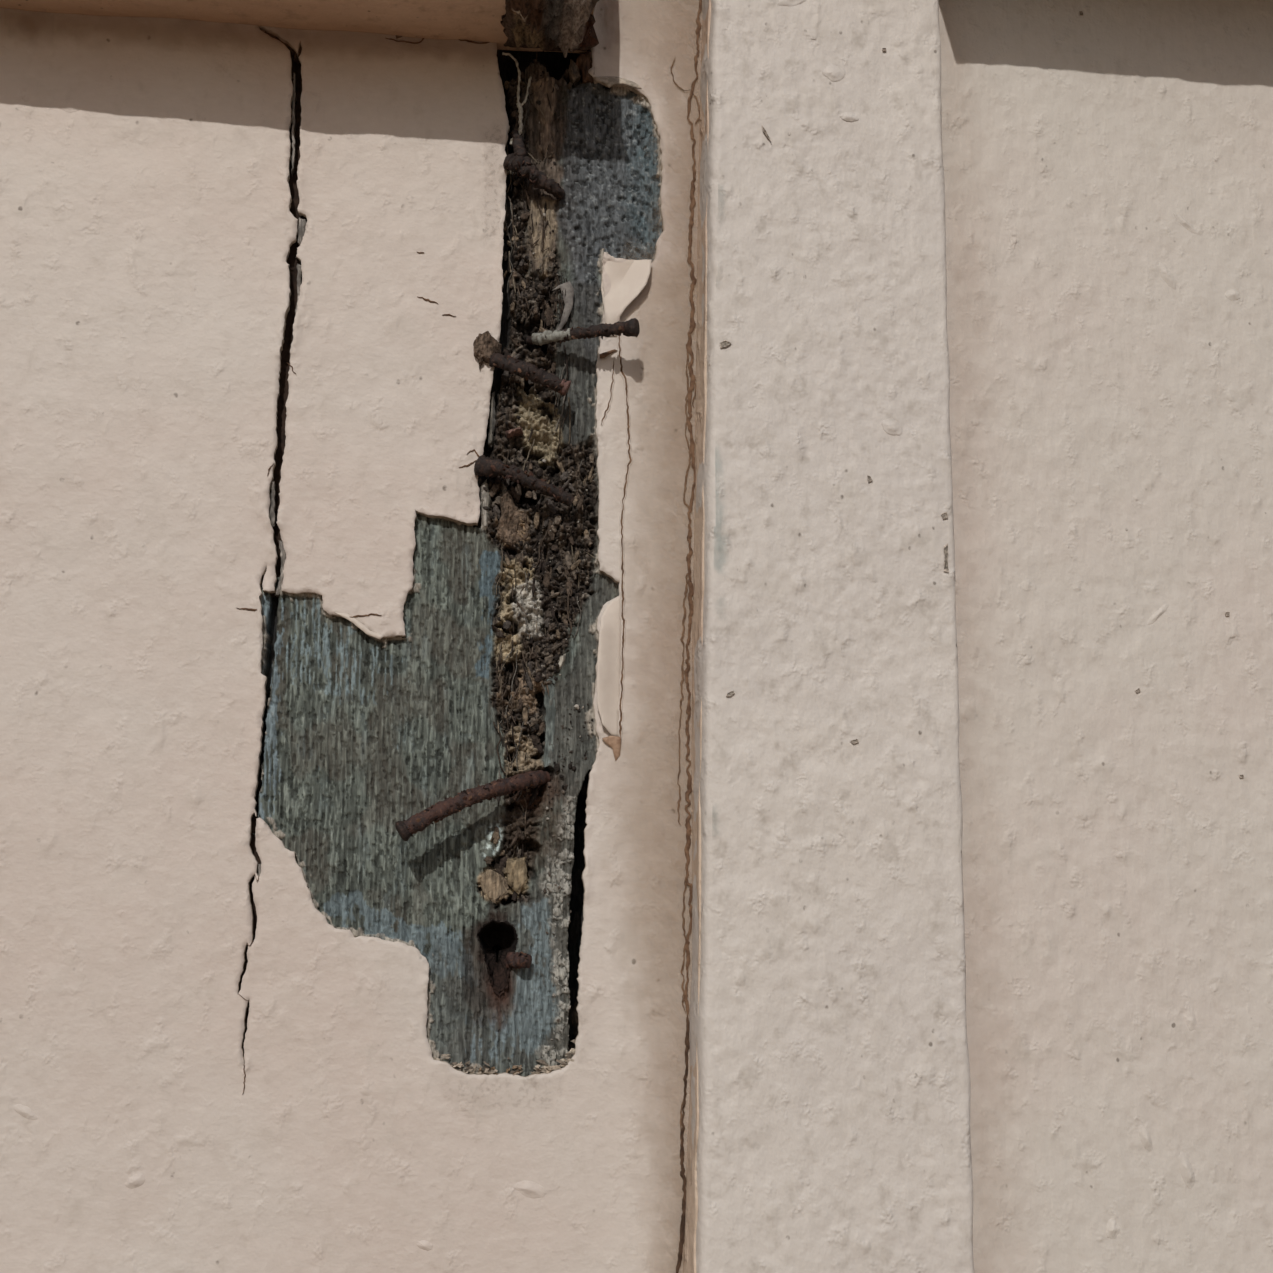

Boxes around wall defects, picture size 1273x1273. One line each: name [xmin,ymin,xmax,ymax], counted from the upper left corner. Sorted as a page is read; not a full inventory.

crack [239,813,261,1095]
crack [238,31,307,611]
peeling [255,49,663,1077]
corrosion [403,772,534,837]